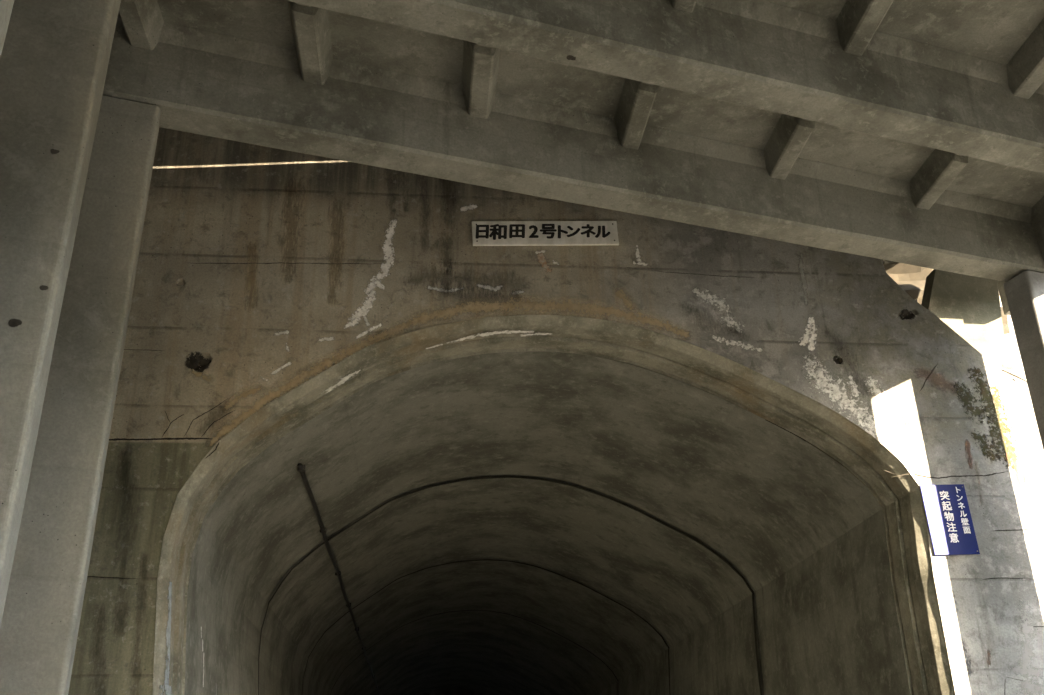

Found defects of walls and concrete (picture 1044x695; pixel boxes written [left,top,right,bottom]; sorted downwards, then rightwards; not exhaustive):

leakage [344,219,397,339]
leakage [799,317,894,446]